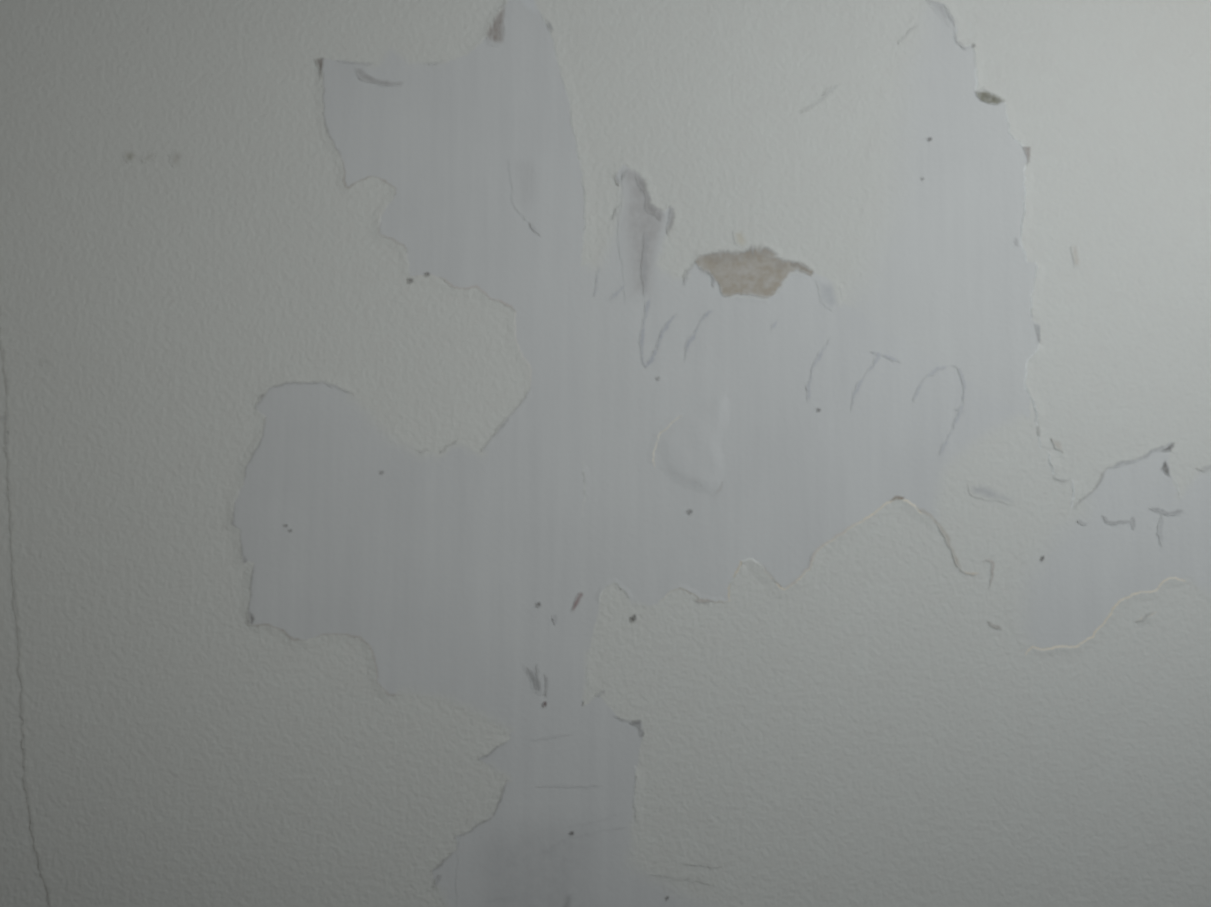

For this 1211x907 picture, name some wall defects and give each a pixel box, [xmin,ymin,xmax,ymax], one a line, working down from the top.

peeling [223,0,1211,734]
crack [1077,507,1185,546]